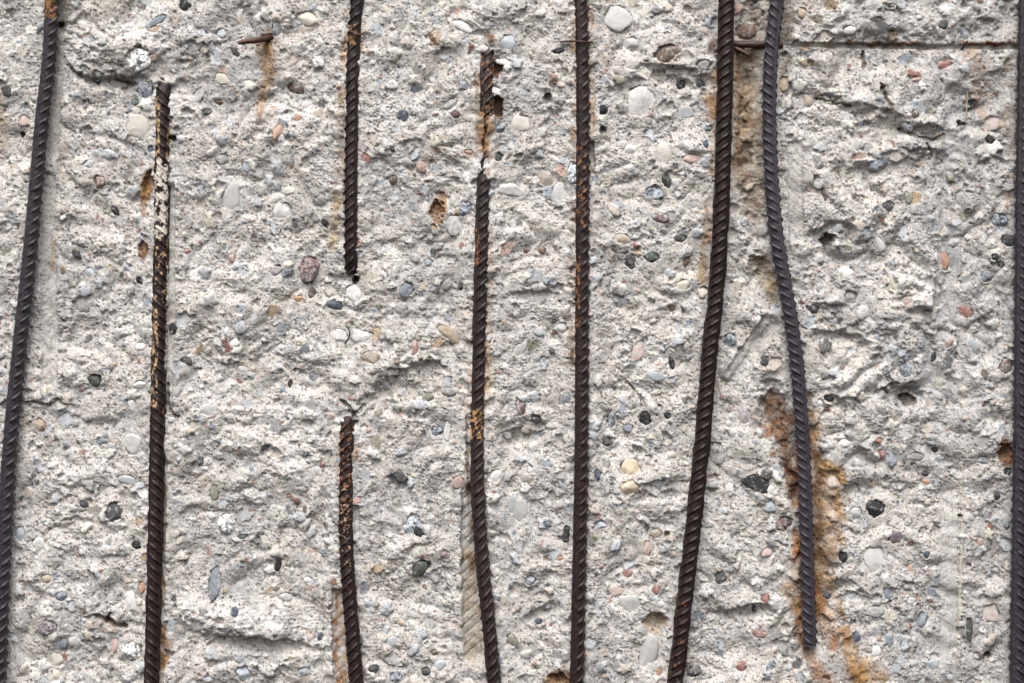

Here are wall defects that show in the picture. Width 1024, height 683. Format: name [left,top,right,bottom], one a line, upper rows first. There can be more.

spalling [0,0,65,683]
spalling [84,72,177,683]
rust [140,178,151,203]
rust [333,581,345,683]
spalling [470,44,505,683]
spalling [502,0,606,683]
rust [705,94,716,116]
spalling [624,0,873,683]
rust [765,389,798,506]
rust [794,570,830,681]
rust [807,390,886,683]
spalling [977,0,1024,683]